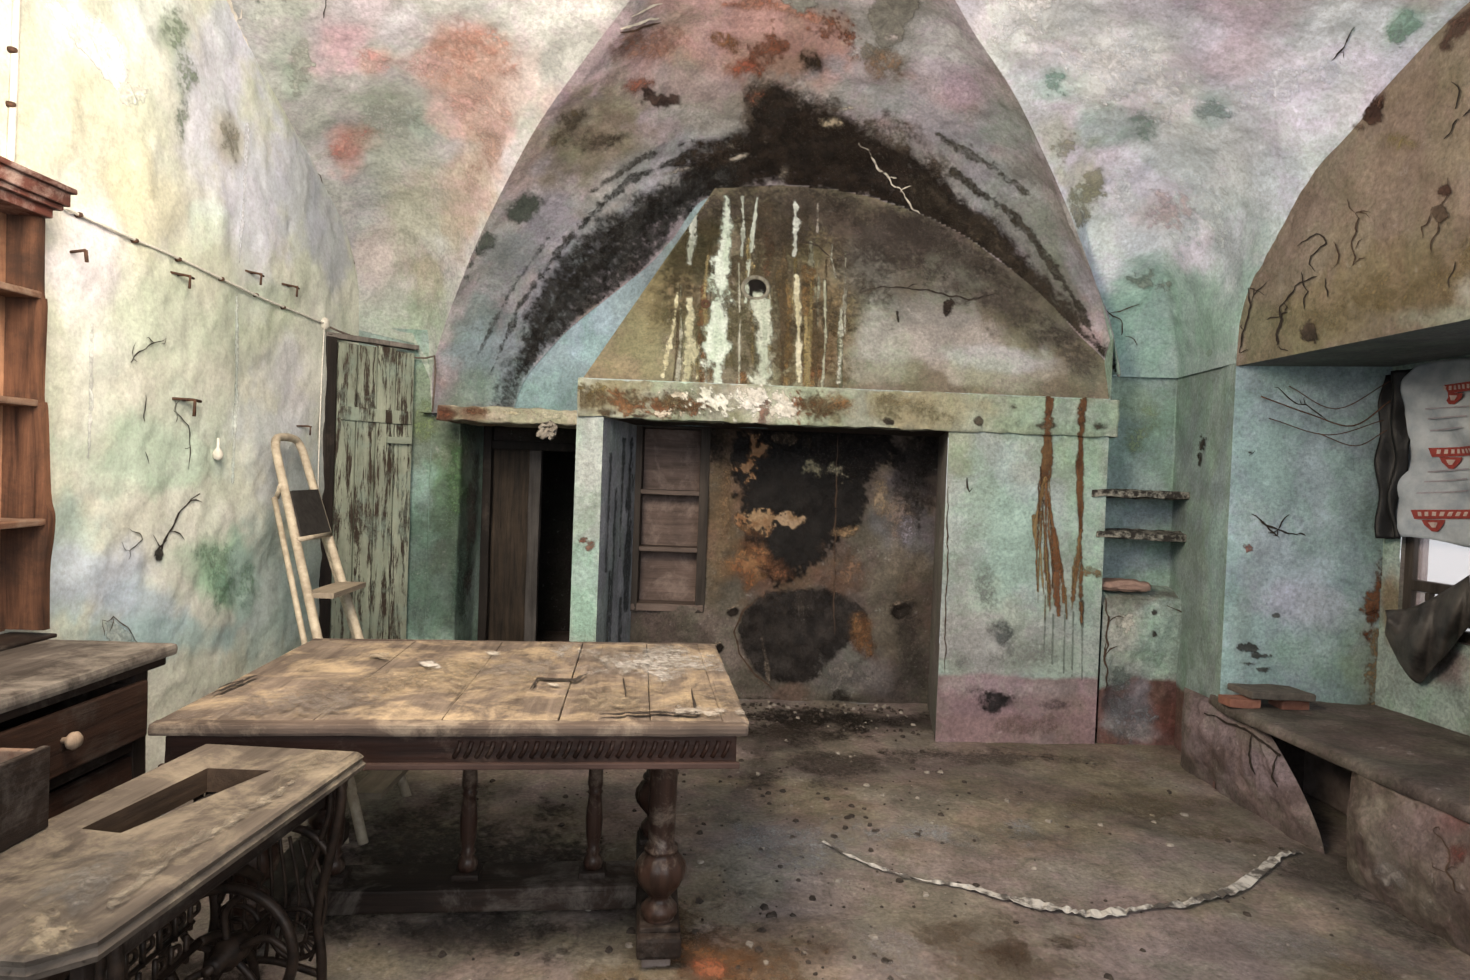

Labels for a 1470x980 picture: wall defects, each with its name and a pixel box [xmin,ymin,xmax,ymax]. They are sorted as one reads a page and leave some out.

water stain [464,231,495,279]
flaking render [550,110,625,150]
flaking render [641,87,680,107]
water stain [481,143,865,420]
crack [858,143,920,214]
water stain [909,132,1117,372]
crack [1239,199,1369,353]
crack [1420,178,1456,286]
crack [122,398,201,561]
corrosion [578,283,714,421]
corrosion [756,400,770,424]
corrosion [1031,396,1101,627]